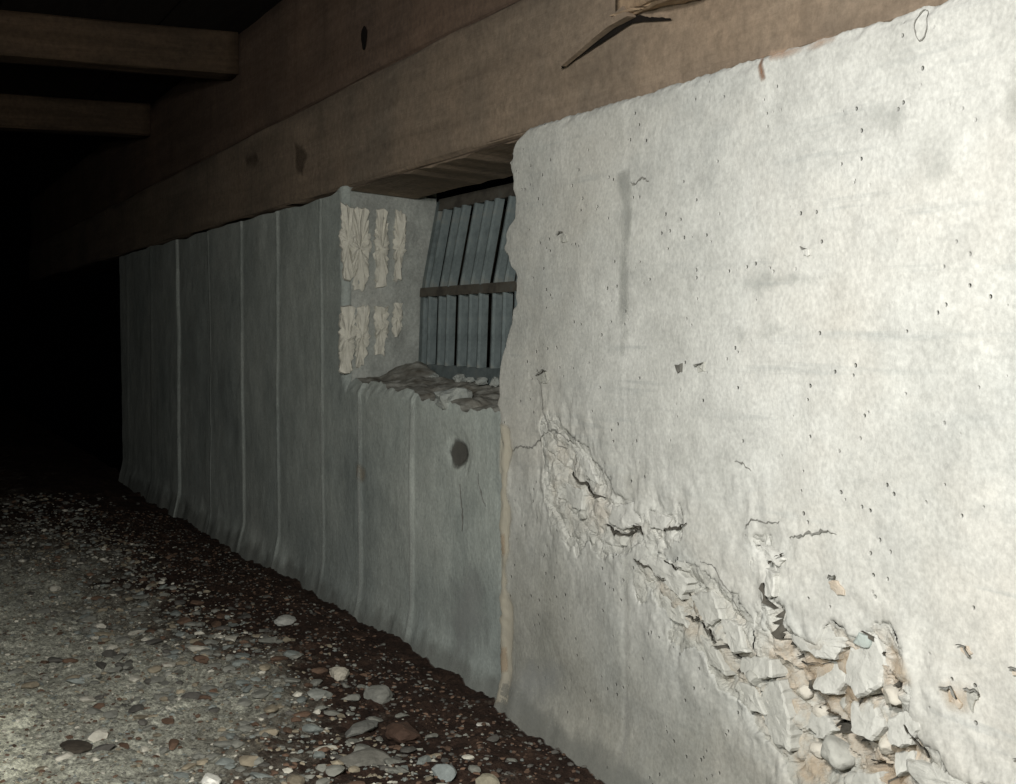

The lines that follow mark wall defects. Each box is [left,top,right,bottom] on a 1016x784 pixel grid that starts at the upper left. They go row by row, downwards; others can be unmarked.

crack [512,379,577,472]
crack [745,518,777,529]
crack [703,562,743,617]
spalling [540,411,967,784]
spalling [938,686,979,712]